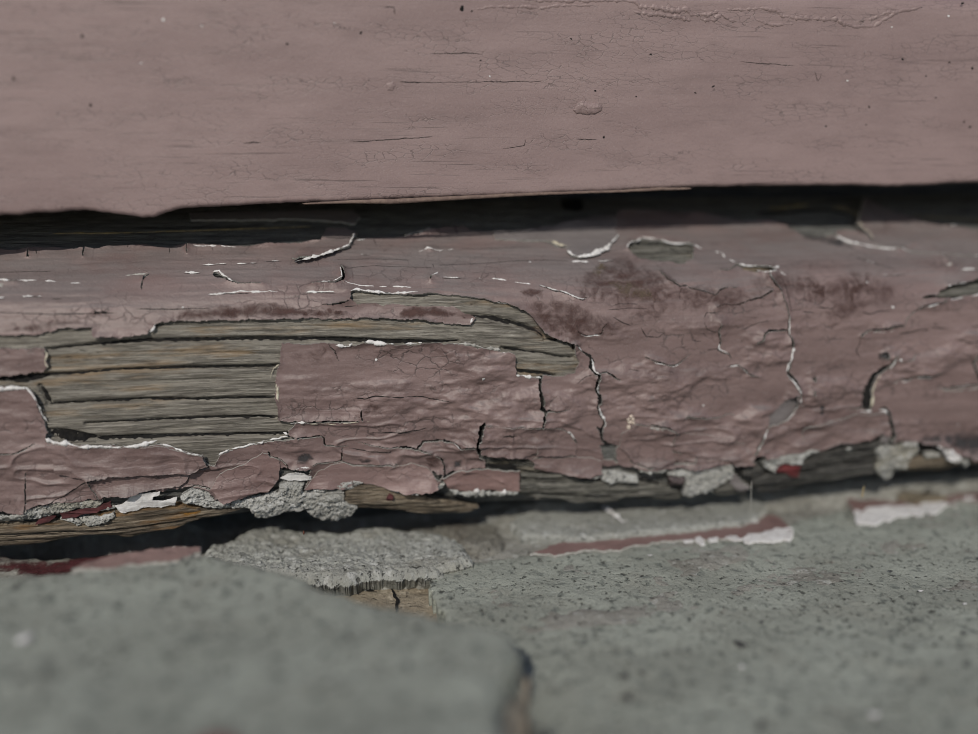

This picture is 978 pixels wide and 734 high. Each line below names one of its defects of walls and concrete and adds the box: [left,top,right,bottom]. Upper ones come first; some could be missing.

crack [307,226,586,307]
peeling [493,214,701,264]
crack [836,236,910,271]
peeling [894,279,978,327]
peeling [0,288,603,525]
crack [306,396,517,481]
crack [538,375,577,442]
crack [577,273,837,464]
peeling [666,433,756,491]
peeling [802,413,891,451]
crack [856,310,978,438]
peeling [935,446,961,463]